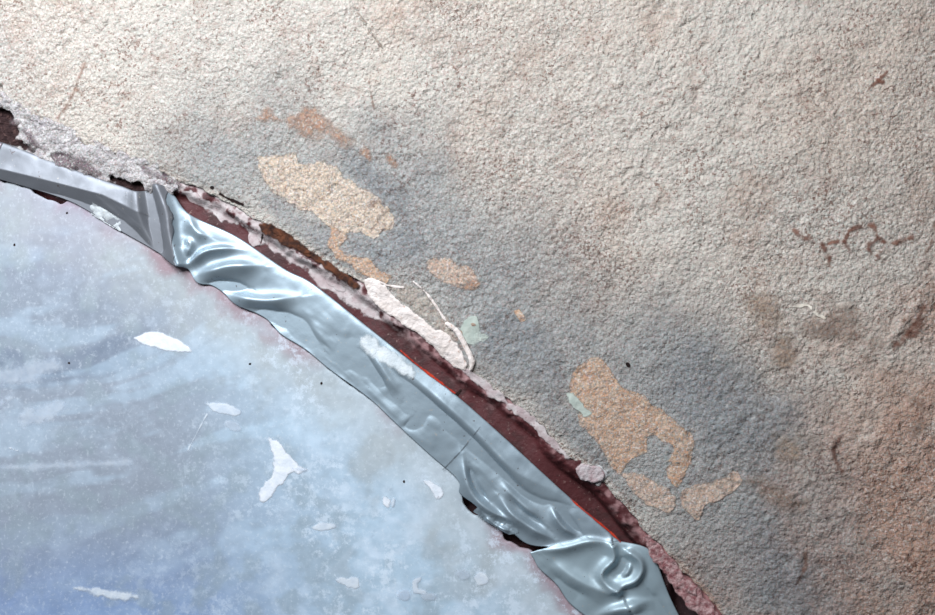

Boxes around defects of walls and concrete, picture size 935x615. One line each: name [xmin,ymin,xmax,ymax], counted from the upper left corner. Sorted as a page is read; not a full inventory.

corrosion [257,107,348,142]
flaking render [0,91,570,458]
corrosion [259,223,360,289]
flaking render [569,357,742,520]